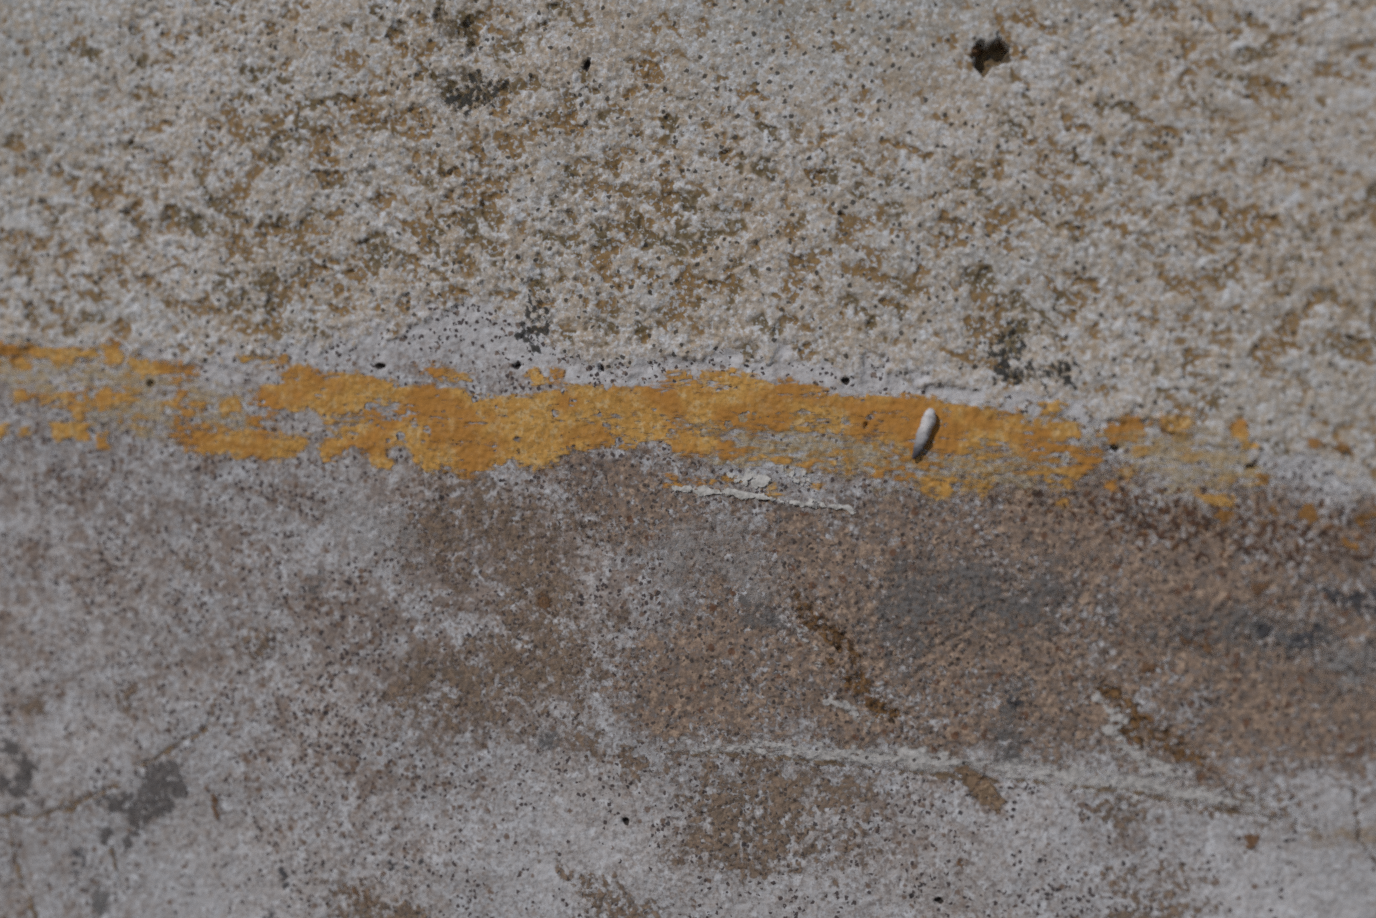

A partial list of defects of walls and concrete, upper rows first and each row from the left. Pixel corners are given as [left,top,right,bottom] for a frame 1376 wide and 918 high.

peeling [0,337,1270,515]
leakage [371,446,1376,887]